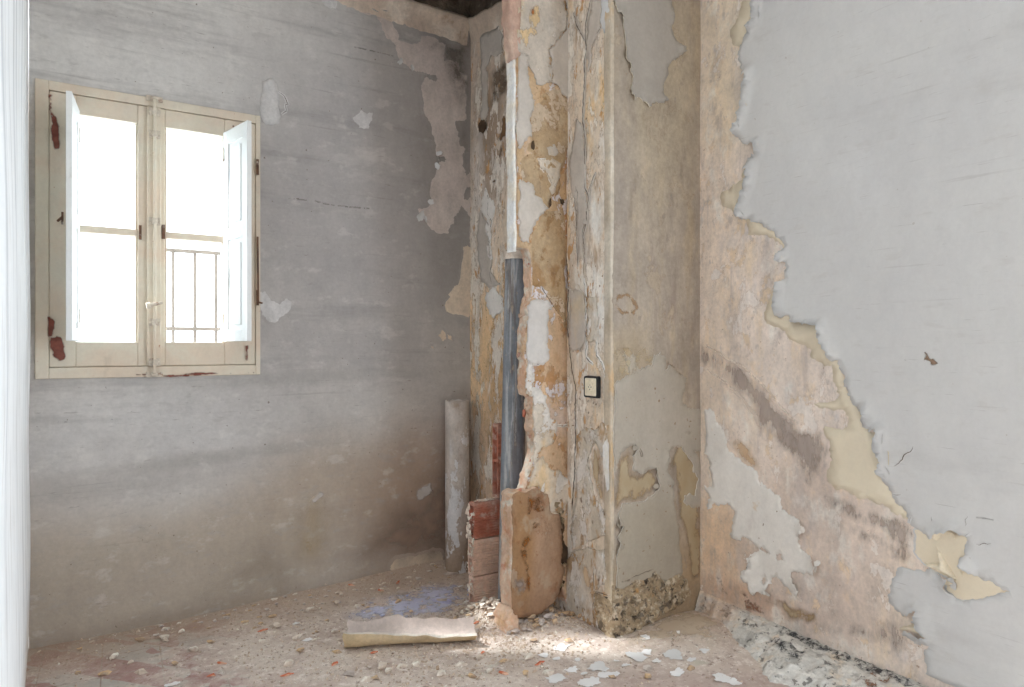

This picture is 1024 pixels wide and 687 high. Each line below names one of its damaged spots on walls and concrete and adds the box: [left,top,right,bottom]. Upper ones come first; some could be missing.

peeling [260,289,295,325]
flaking render [343,0,821,638]
peeling [720,0,1024,687]